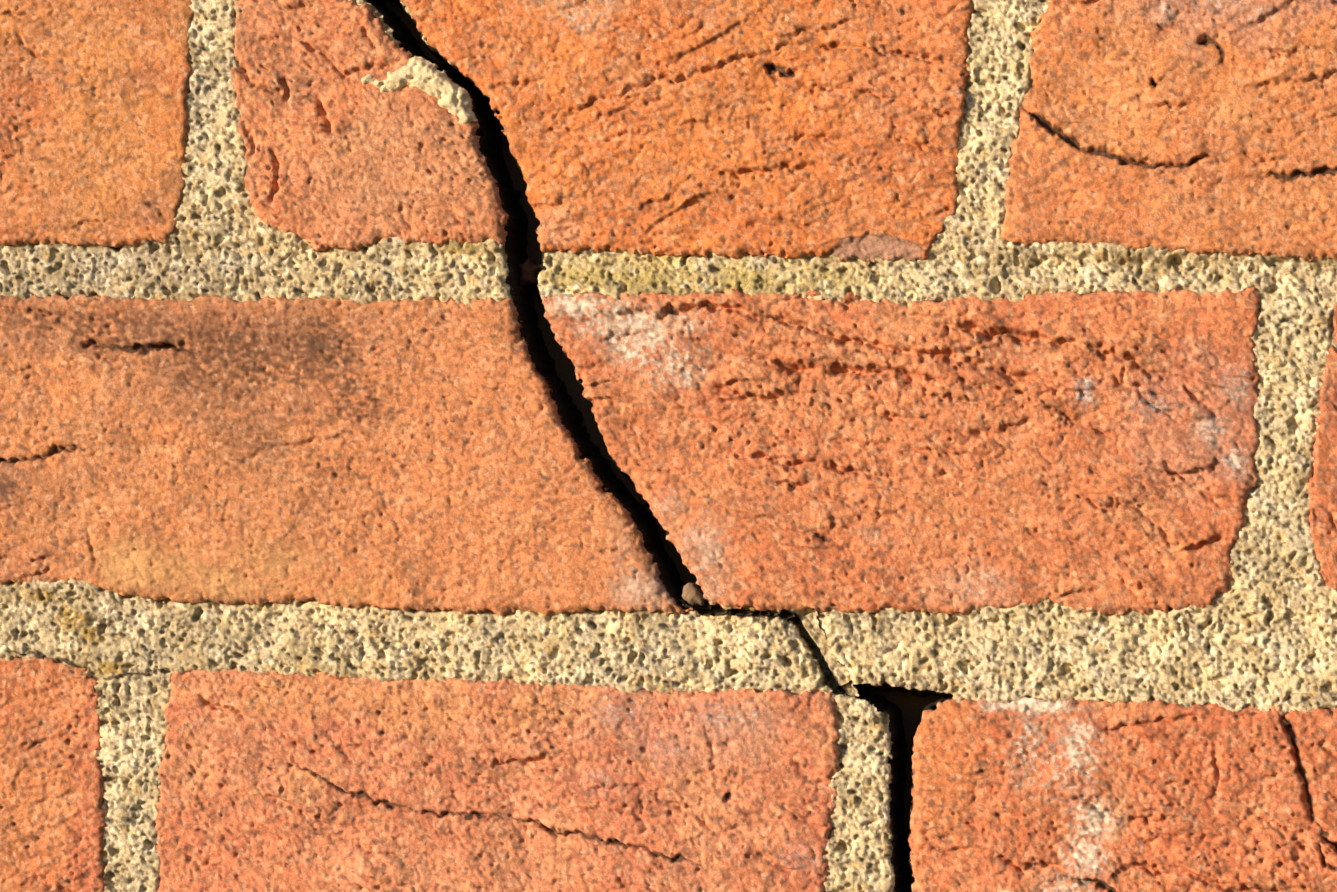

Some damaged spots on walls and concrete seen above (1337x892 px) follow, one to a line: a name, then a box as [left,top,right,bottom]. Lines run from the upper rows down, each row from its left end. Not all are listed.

crack [300,768,687,862]
crack [366,0,953,892]